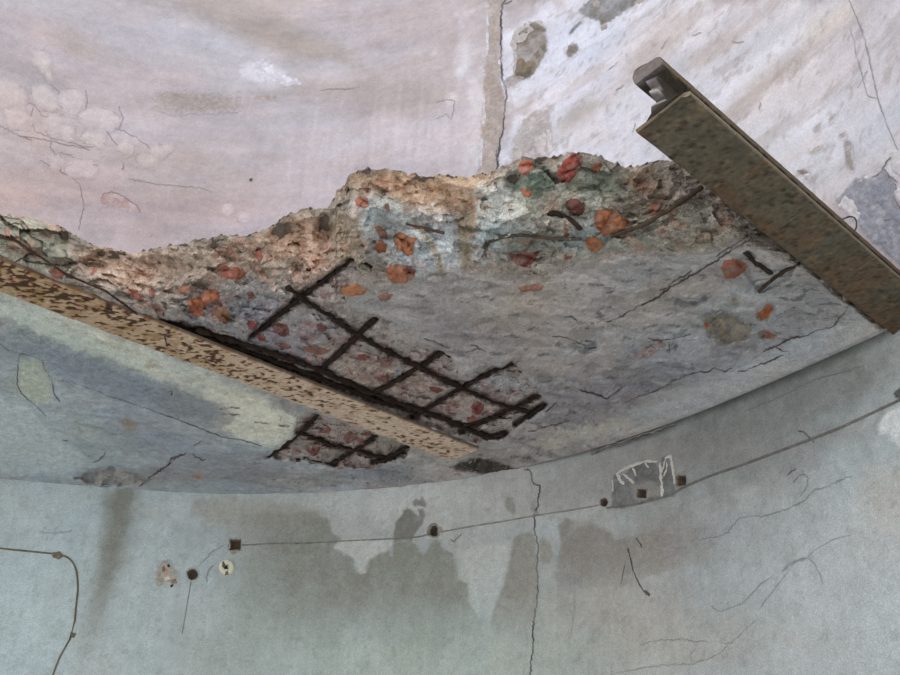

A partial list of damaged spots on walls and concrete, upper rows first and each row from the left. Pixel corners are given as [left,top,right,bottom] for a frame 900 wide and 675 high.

crack [495,0,512,169]
crack [849,0,900,221]
leakage [0,323,236,428]
crack [0,344,262,487]
spalling [267,412,413,486]
spalling [0,0,900,443]
spalling [448,455,519,476]
peeling [598,454,689,509]
crack [552,235,753,349]
crack [580,306,848,403]
leakage [80,485,143,641]
leakage [183,494,740,653]